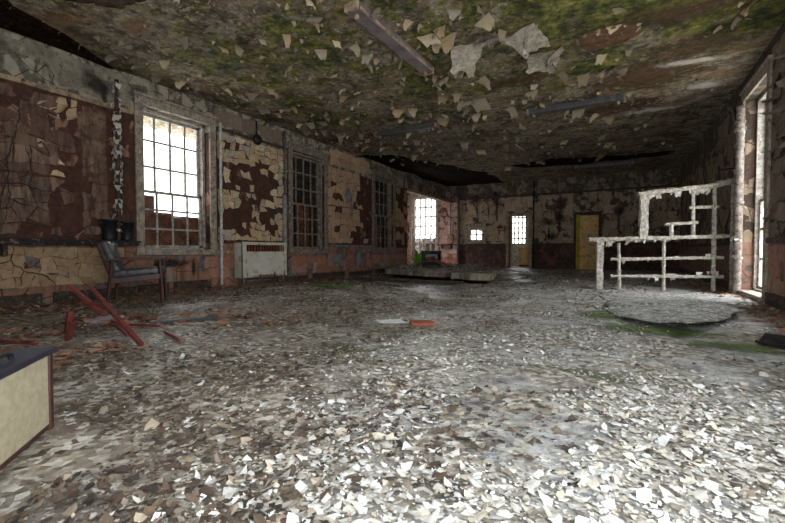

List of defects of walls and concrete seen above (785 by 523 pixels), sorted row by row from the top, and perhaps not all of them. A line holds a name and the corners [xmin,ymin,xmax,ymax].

peeling [704,0,757,38]
damp [491,73,546,89]
spalling [135,0,686,247]
peeling [291,187,407,273]
peeling [439,194,574,258]
crack [0,246,56,287]
peeling [0,246,109,289]
peeling [204,257,230,278]